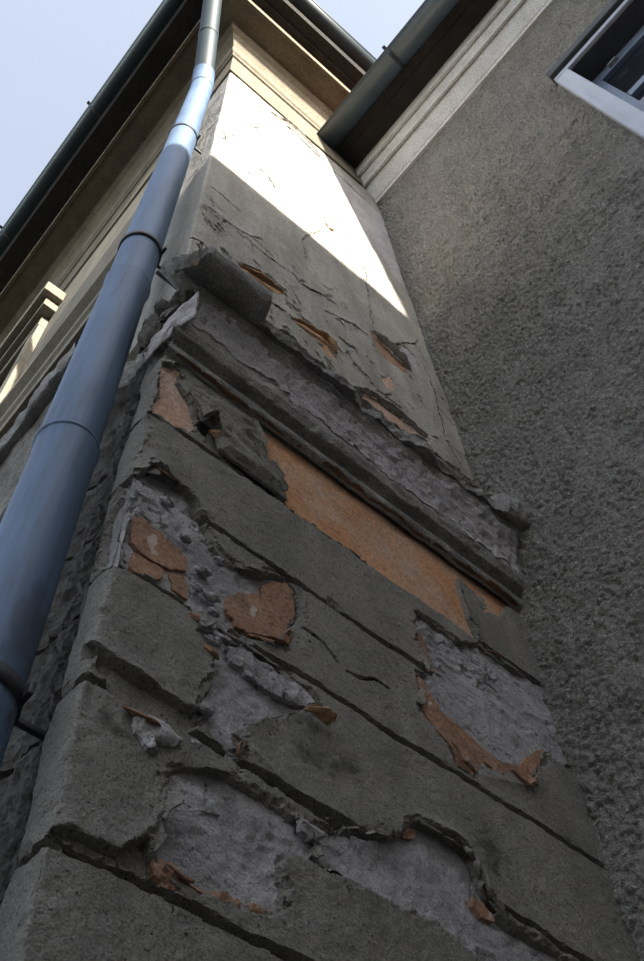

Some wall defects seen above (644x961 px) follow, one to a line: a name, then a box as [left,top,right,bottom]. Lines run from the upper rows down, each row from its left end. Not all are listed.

flaking render [240,262,283,294]
crack [294,231,374,330]
peeling [138,287,519,573]
crack [397,341,465,456]
spalling [106,433,567,961]